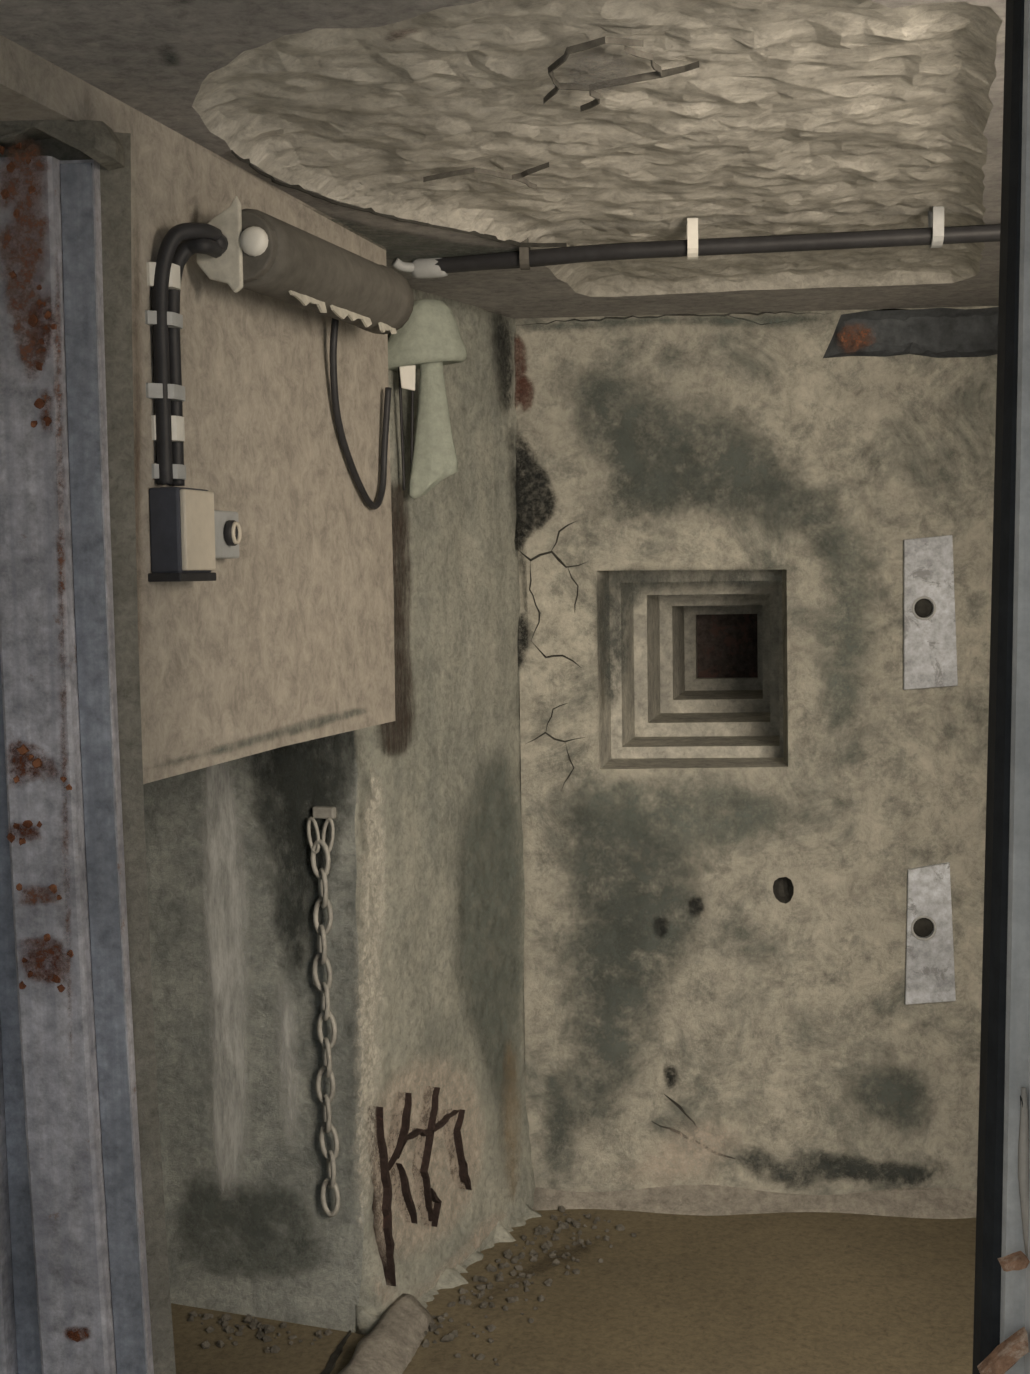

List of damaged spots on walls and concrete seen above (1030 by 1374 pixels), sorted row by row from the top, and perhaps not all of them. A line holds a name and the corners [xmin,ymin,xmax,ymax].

crack [543,36,699,112]
crack [231,150,567,248]
rust [0,143,64,509]
rust [57,530,65,661]
water stain [578,379,865,717]
rust [7,728,72,851]
rust [19,933,74,1009]
water stain [185,710,359,1273]
water stain [549,783,786,1154]
water stain [856,1069,924,1127]
water stain [742,1150,936,1187]
rust [65,1328,89,1342]